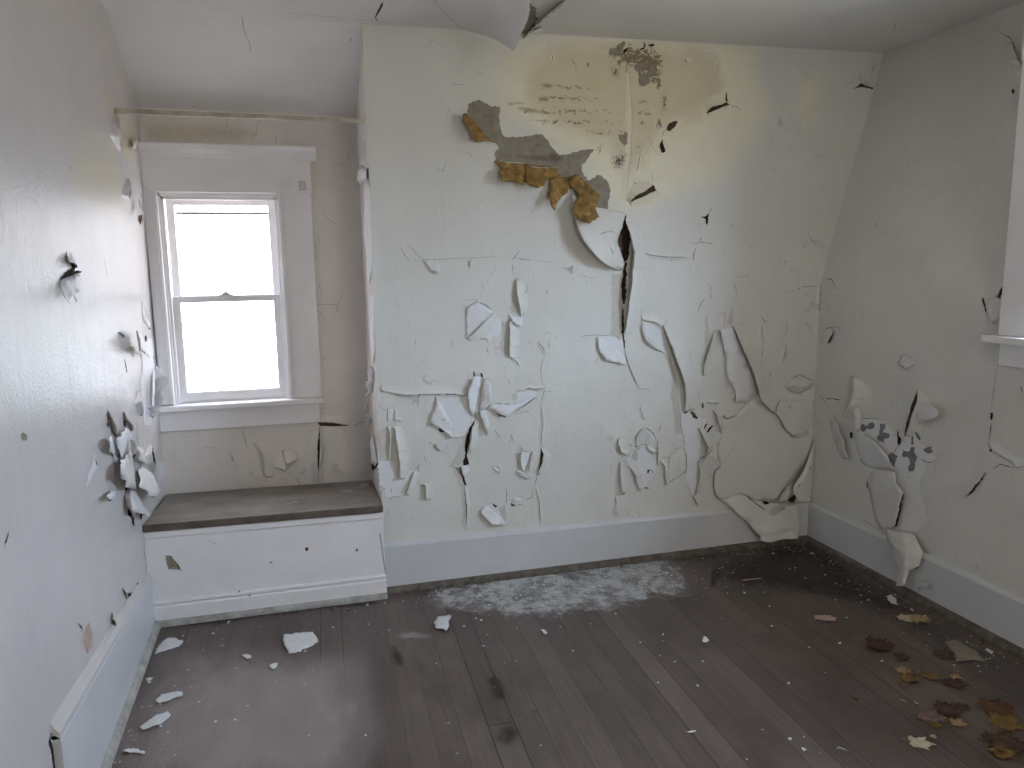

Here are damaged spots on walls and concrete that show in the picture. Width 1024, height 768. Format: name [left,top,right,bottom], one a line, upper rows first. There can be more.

peeling [434,0,568,51]
water stain [477,33,787,230]
spalling [463,100,626,271]
spalling [60,250,82,303]
peeling [464,301,522,343]
peeling [718,305,777,411]
spalling [106,302,169,527]
peeling [429,384,545,452]
peeling [480,488,534,526]
peeling [625,403,719,495]
peeling [722,440,816,542]
spalling [829,401,938,605]